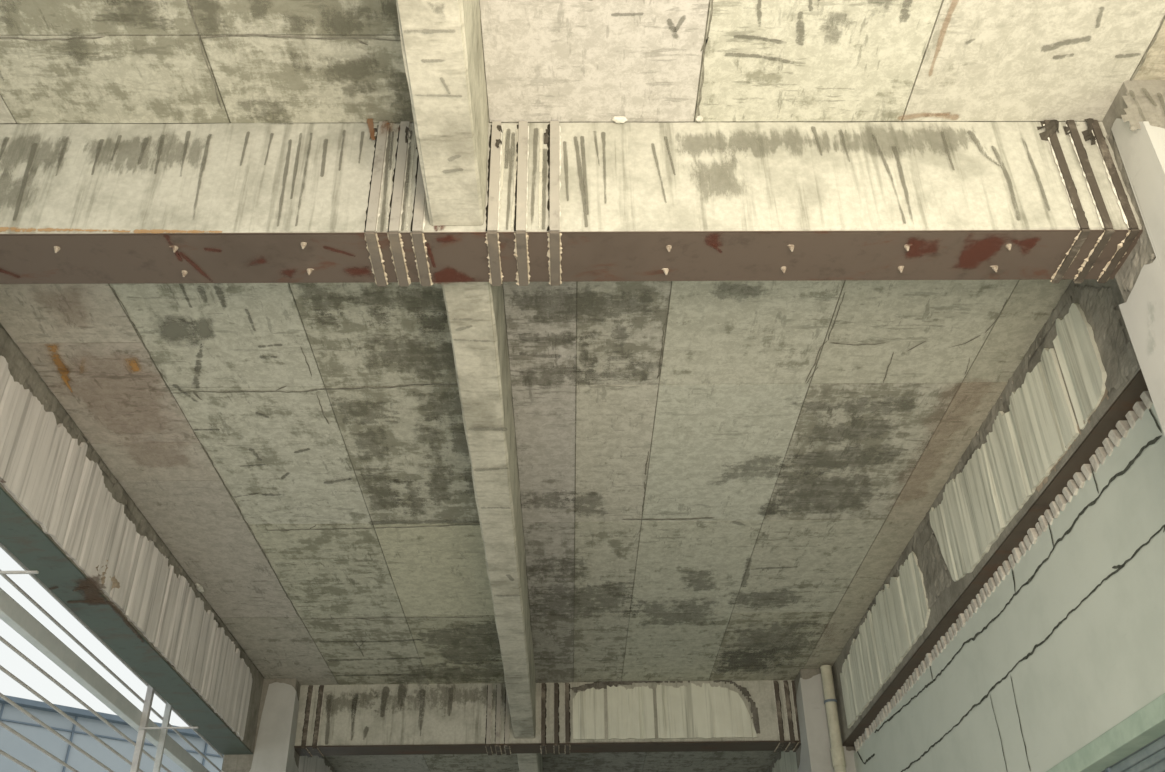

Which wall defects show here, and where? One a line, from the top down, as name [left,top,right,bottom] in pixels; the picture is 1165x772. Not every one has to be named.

damp [13,143,37,220]
damp [91,135,121,175]
damp [138,135,165,174]
damp [194,134,212,207]
rust [907,239,936,258]
rust [958,237,1039,269]
flaking render [844,118,1155,658]
flaking render [0,327,228,631]
rust [67,575,144,642]
crack [857,409,1165,772]
flaking render [570,680,690,693]
flaking render [714,680,760,734]